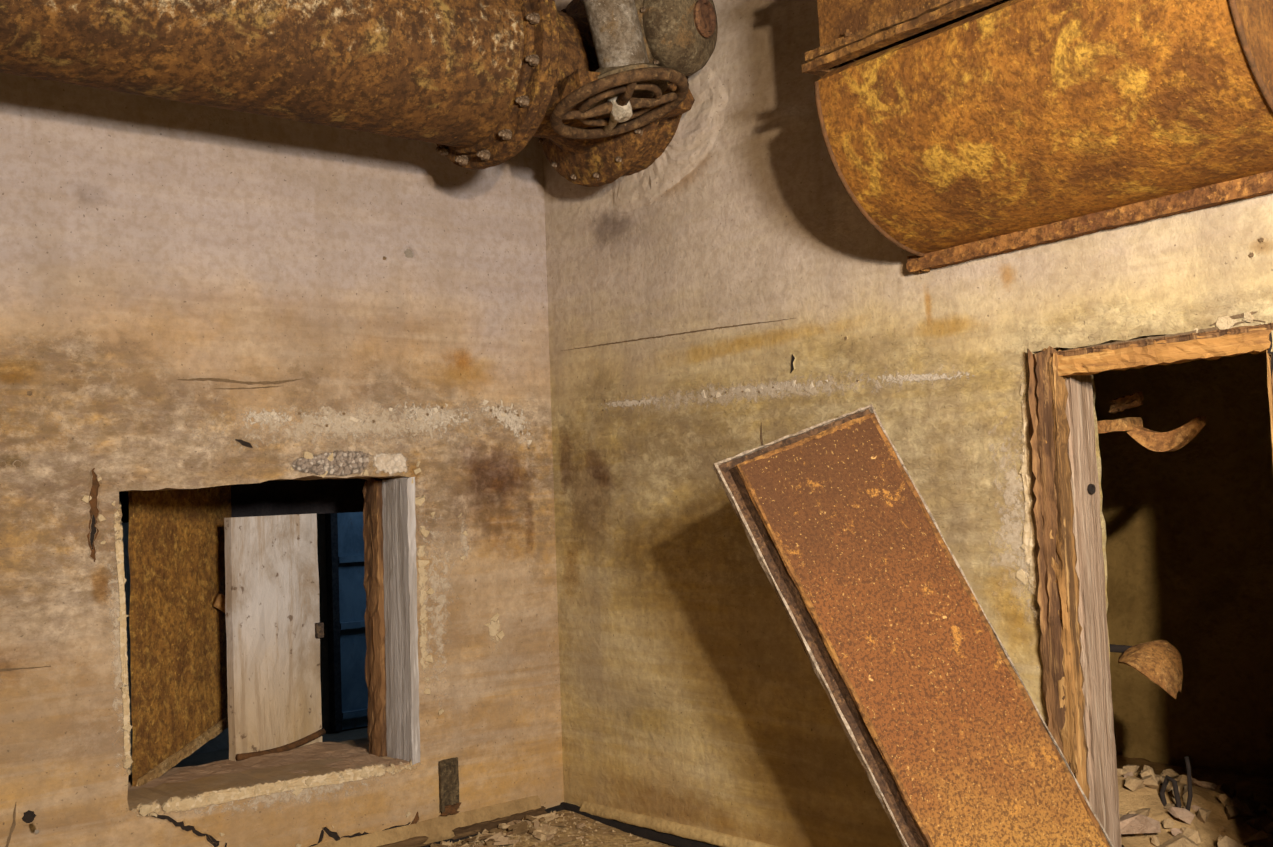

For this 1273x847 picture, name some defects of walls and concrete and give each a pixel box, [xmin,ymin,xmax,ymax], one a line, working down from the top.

spalling [290,451,421,484]
crack [81,468,106,562]
crack [0,665,50,673]
crack [138,810,227,847]
crack [295,811,420,847]